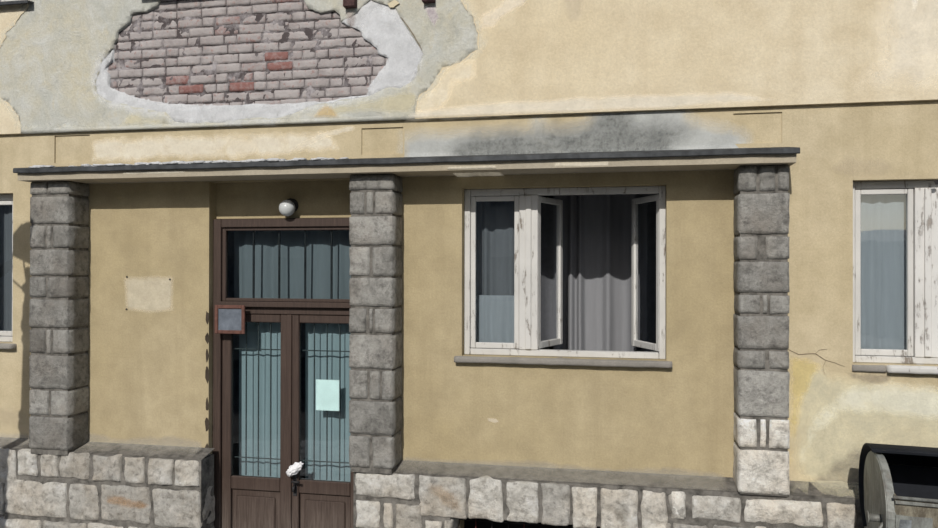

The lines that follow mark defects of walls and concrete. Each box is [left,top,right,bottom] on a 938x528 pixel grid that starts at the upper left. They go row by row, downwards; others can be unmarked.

flaking render [0,0,524,160]
damp [384,95,751,157]
spalling [448,166,501,177]
crack [788,349,845,374]